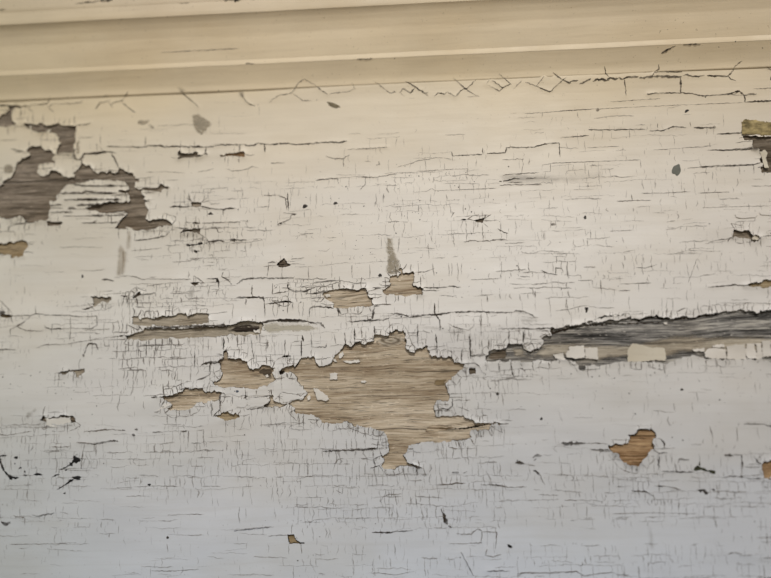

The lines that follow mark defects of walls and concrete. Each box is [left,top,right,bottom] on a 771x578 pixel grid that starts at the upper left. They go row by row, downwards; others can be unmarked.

peeling [742,119,771,173]
peeling [0,105,172,231]
peeling [0,239,28,258]
peeling [383,268,423,297]
peeling [748,279,771,288]
peeling [323,288,374,309]
peeling [126,313,264,341]
peeling [158,307,771,470]
crack [562,428,694,514]
peeling [762,460,771,480]
crack [324,426,627,576]
crack [236,527,302,553]